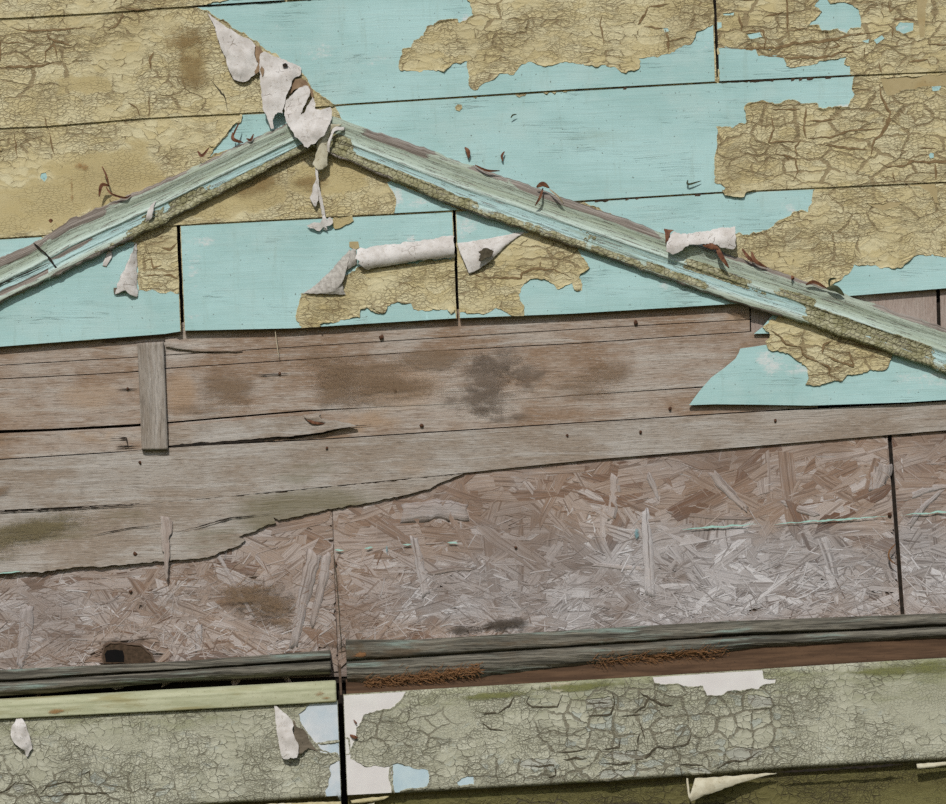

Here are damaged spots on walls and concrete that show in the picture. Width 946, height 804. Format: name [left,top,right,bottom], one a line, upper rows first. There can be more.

crack [108,0,151,30]
peeling [807,0,885,45]
crack [0,27,83,68]
peeling [196,0,856,238]
peeling [0,180,531,347]
peeling [317,248,739,327]
peeling [830,252,946,296]
peeling [269,691,432,804]
crack [483,694,563,731]
crack [526,692,758,778]
peeling [651,670,777,710]
crack [0,771,119,797]